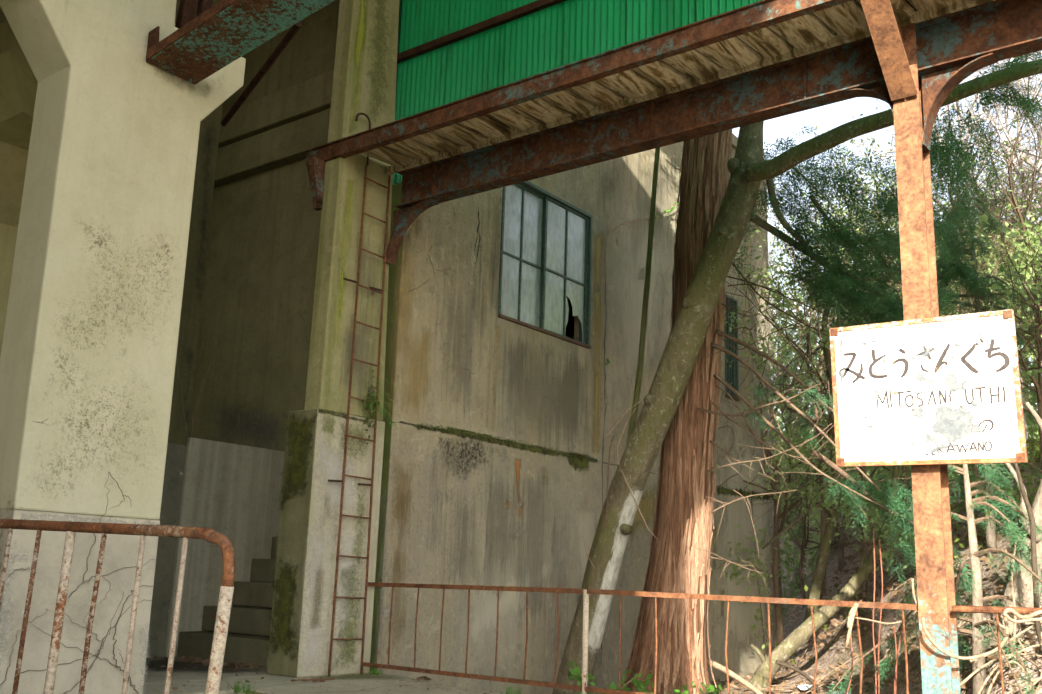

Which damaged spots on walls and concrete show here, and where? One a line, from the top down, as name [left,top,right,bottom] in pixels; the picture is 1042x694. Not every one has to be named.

leakage [439,438,505,478]
leakage [575,509,595,588]
leakage [472,544,567,642]